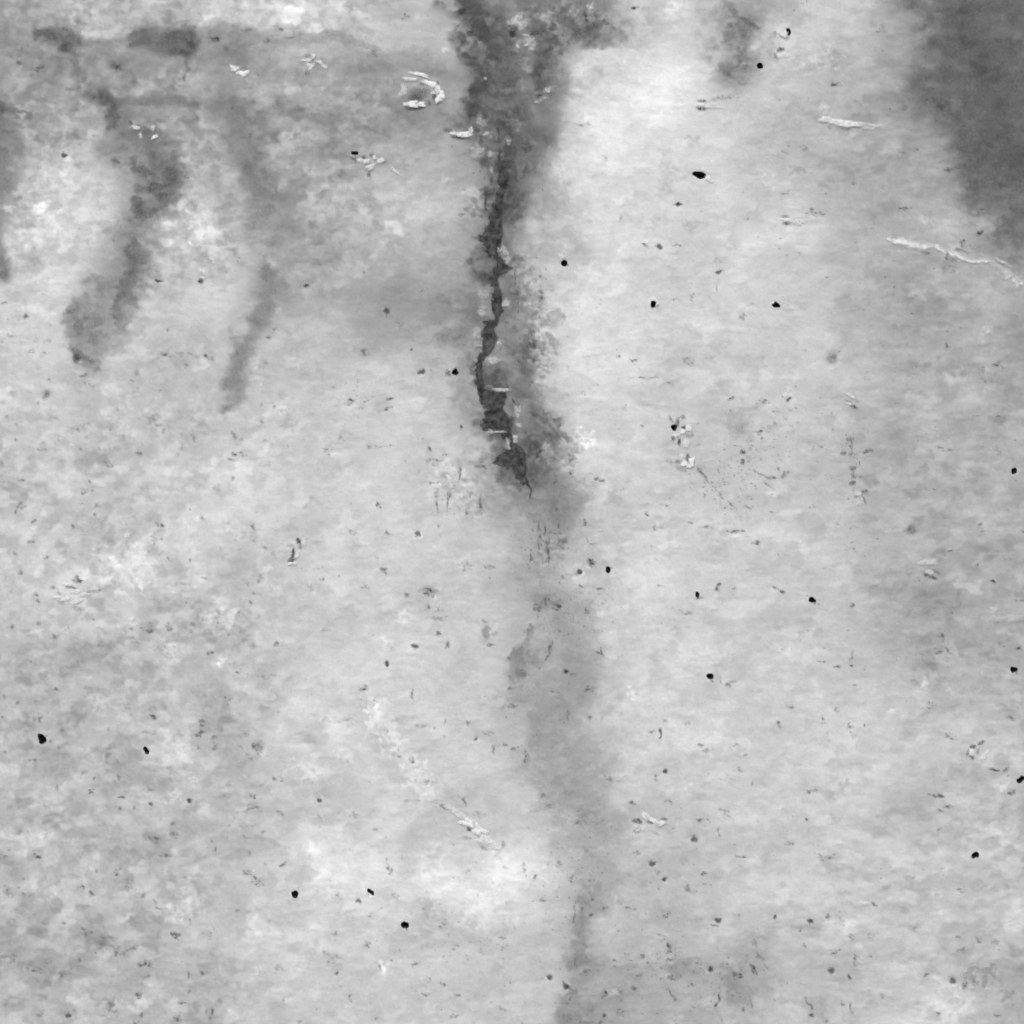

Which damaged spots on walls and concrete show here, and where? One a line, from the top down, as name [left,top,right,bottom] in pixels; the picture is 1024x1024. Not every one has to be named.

crack [517,14,534,46]
crack [475,118,549,494]